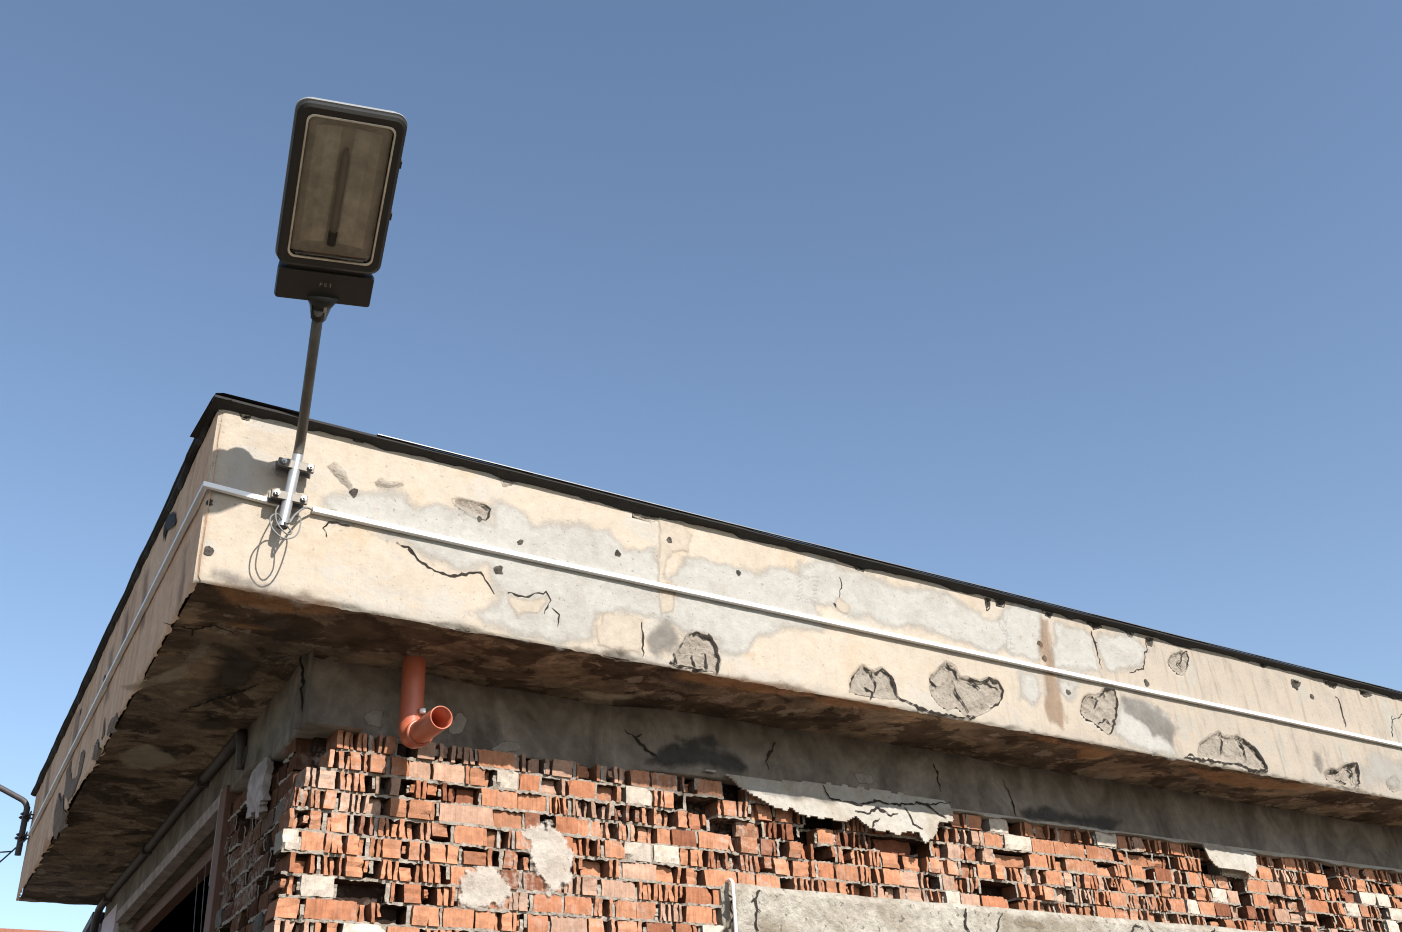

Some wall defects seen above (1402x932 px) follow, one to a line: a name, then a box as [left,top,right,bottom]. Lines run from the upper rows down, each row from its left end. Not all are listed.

crack [323,521,349,536]
crack [396,542,560,625]
peeling [324,462,1268,773]
spalling [1324,762,1360,788]
peeling [705,769,1402,878]
spalling [1015,917,1045,929]